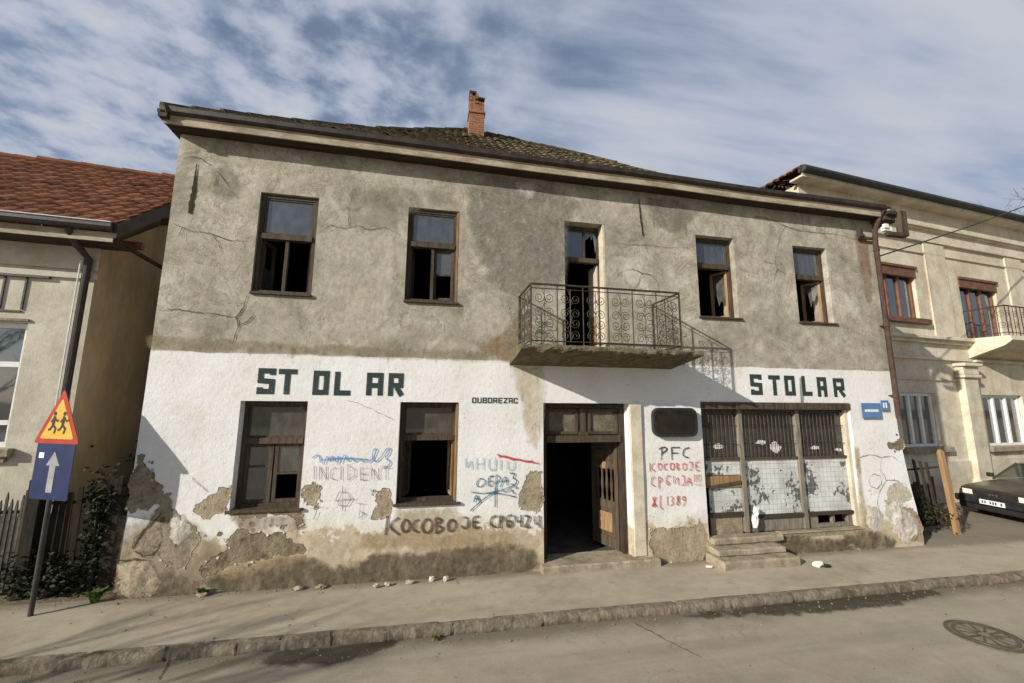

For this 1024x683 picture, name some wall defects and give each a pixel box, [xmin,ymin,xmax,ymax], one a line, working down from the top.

crack [173,156,239,248]
crack [322,193,400,235]
crack [160,298,254,344]
peeling [887,434,905,453]
peeling [125,454,322,578]
peeling [370,488,392,520]
peeling [516,470,545,513]
peeling [648,516,708,563]
peeling [887,479,924,542]
damp [112,544,538,600]